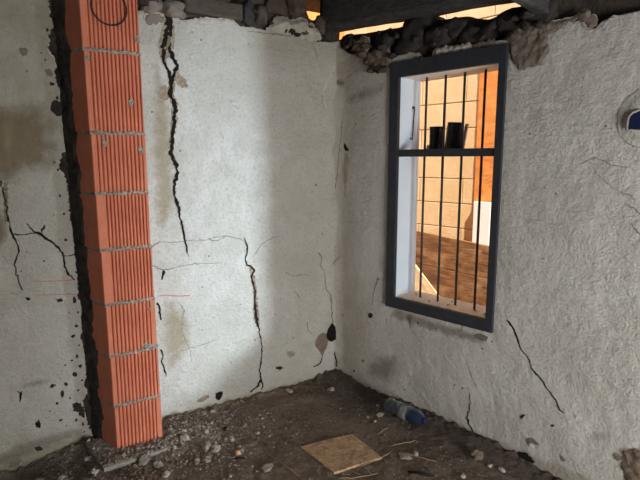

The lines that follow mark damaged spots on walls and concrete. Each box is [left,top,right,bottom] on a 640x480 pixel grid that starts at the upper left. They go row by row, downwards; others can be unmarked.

flaking render [40,0,60,88]
flaking render [285,19,314,37]
flaking render [348,35,391,74]
flaking render [504,8,598,71]
leakage [0,112,51,174]
crack [0,181,75,295]
flaking render [53,144,73,231]
crack [152,13,279,392]
flaking render [49,325,93,436]
flaking render [315,332,329,357]
crack [507,320,564,413]
flaking render [613,448,640,480]